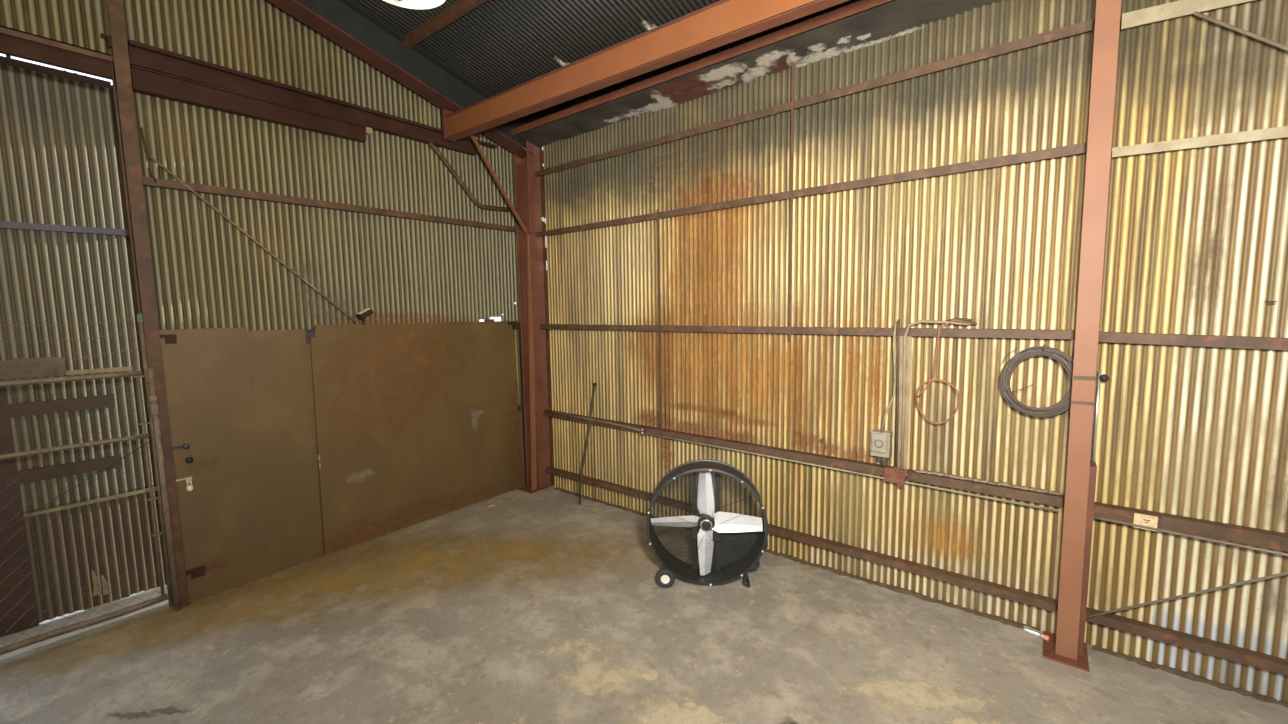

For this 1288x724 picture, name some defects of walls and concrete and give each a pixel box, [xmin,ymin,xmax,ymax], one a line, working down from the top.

peeling [700,26,924,90]
peeling [604,90,677,123]